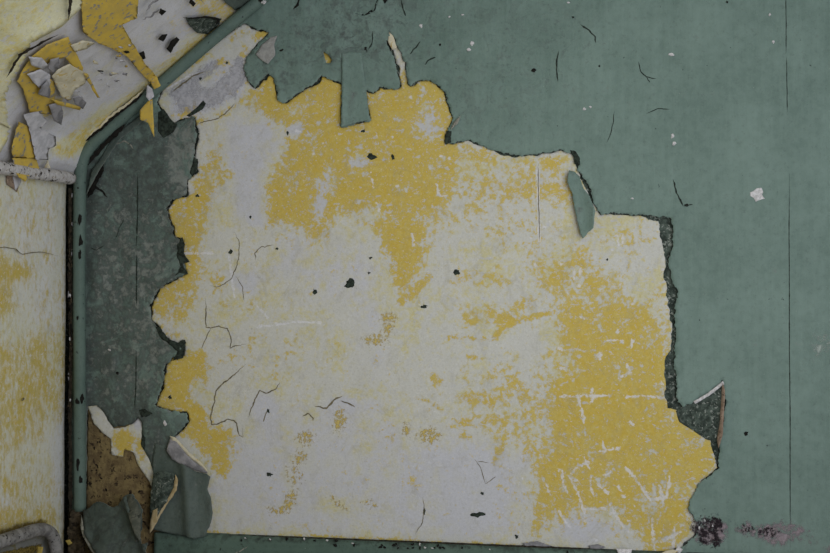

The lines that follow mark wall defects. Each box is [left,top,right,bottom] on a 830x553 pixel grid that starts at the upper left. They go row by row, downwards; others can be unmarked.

peeling [224,0,266,11]
peeling [183,16,221,34]
peeling [12,0,161,169]
peeling [6,173,30,192]
crack [202,233,271,348]
peeling [67,24,725,553]
crack [210,368,280,437]
crack [303,396,355,420]
leakage [688,514,810,548]